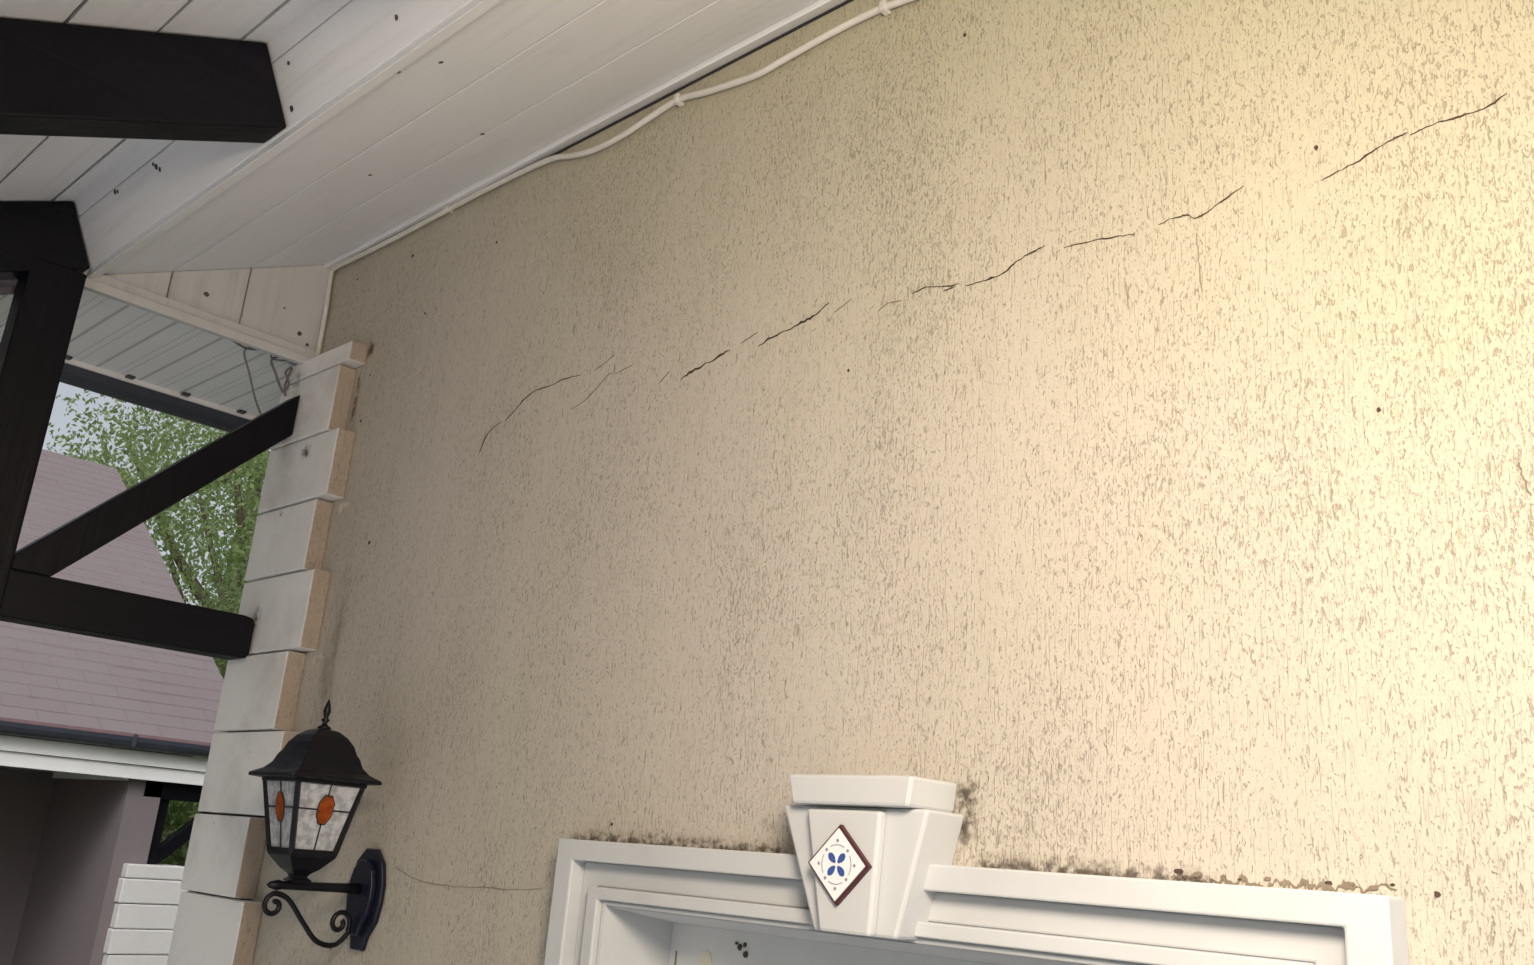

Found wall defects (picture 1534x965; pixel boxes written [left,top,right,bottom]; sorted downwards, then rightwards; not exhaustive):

crack [1321,93,1507,181]
crack [479,186,1244,453]